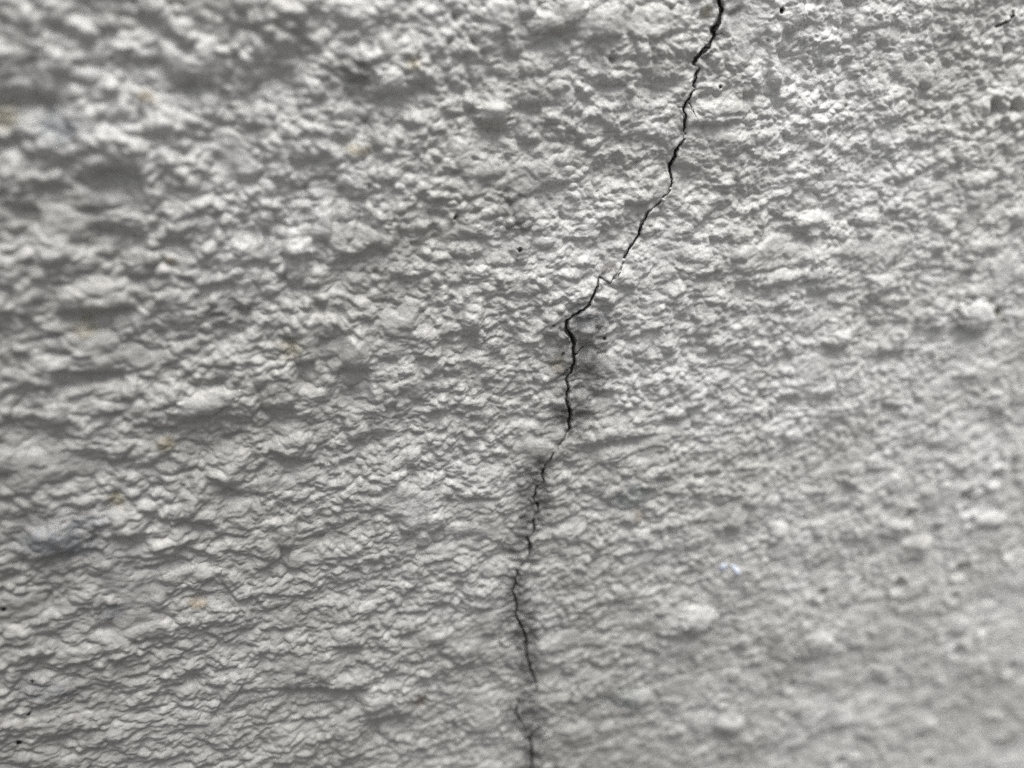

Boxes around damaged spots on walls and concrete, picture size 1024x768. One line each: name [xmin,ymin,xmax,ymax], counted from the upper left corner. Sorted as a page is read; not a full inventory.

crack [512,0,726,768]